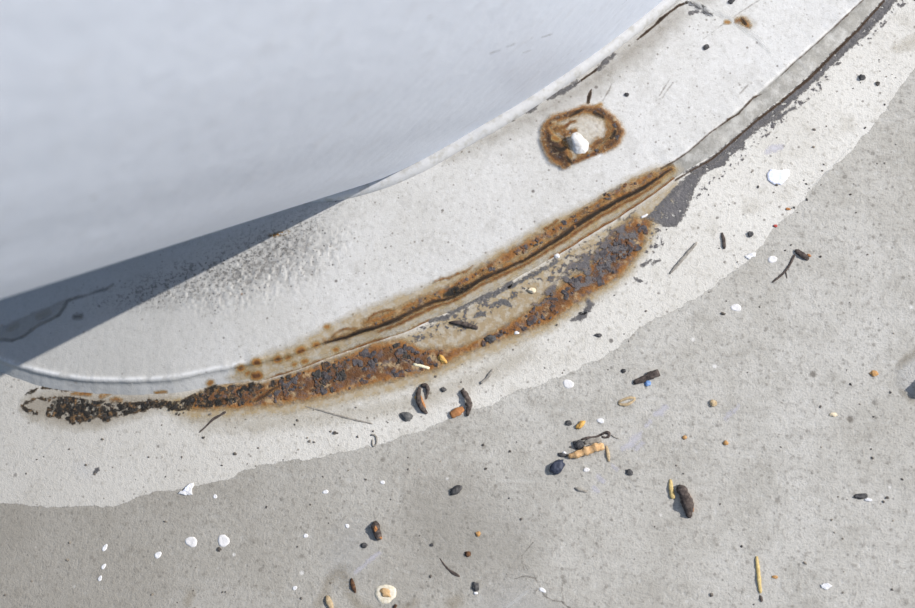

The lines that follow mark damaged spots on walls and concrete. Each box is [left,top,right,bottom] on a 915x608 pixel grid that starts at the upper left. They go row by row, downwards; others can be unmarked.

rust [540,103,625,169]
peeling [640,0,906,267]
rust [155,165,676,418]